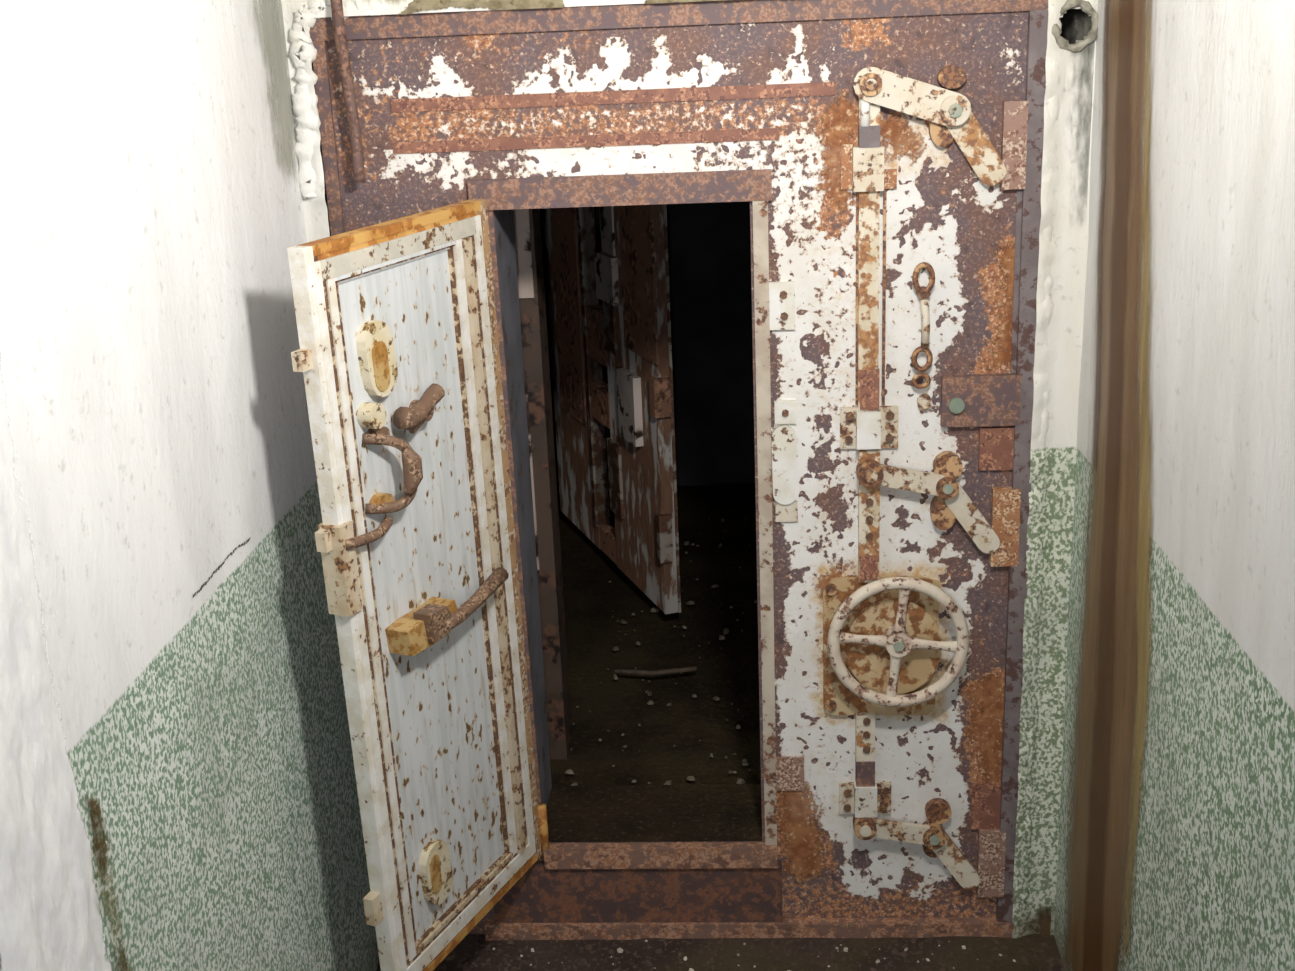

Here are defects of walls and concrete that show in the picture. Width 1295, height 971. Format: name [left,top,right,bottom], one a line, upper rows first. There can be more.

corrosion [814,89,859,211]
corrosion [880,114,926,166]
corrosion [985,240,1015,370]
corrosion [815,560,856,599]
corrosion [962,670,1005,783]
corrosion [777,782,826,884]